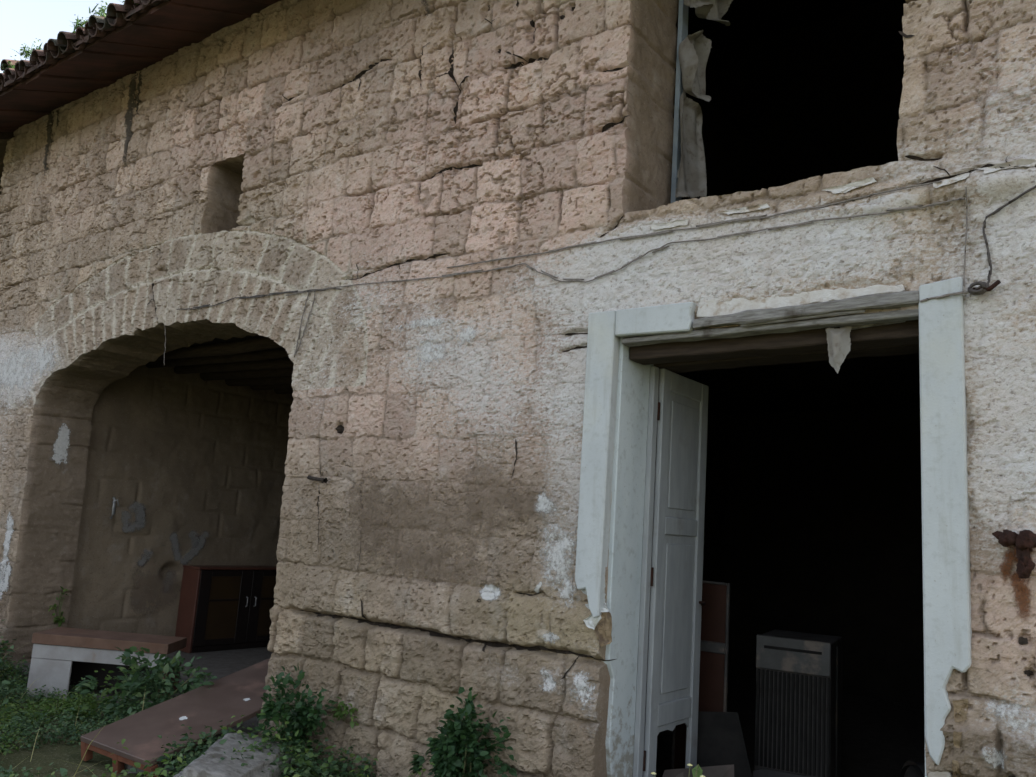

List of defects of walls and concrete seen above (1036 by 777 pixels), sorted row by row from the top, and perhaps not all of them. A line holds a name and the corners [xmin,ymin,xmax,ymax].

water stain [122,72,142,170]
crack [330,59,392,93]
crack [418,42,469,124]
water stain [537,494,556,513]
water stain [0,513,14,598]
water stain [535,525,576,605]
corrosion [999,545,1034,619]